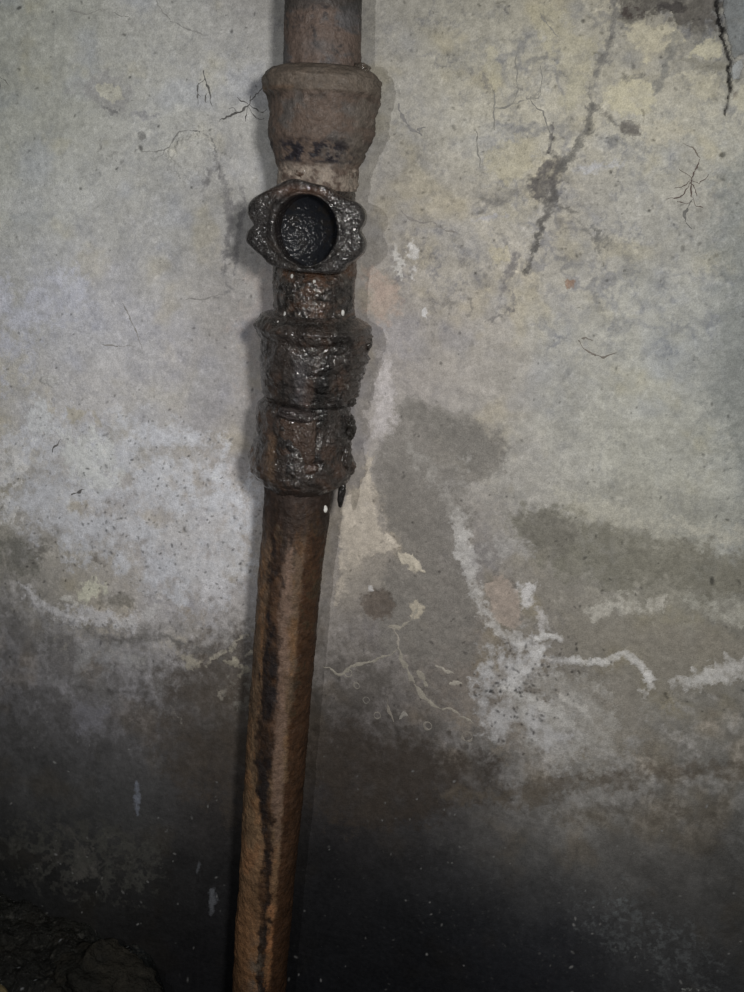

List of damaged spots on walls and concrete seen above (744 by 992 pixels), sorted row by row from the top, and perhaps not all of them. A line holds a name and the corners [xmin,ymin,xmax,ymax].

crack [476,55,552,166]
crack [714,0,737,116]
water stain [0,250,264,992]
water stain [286,116,744,992]